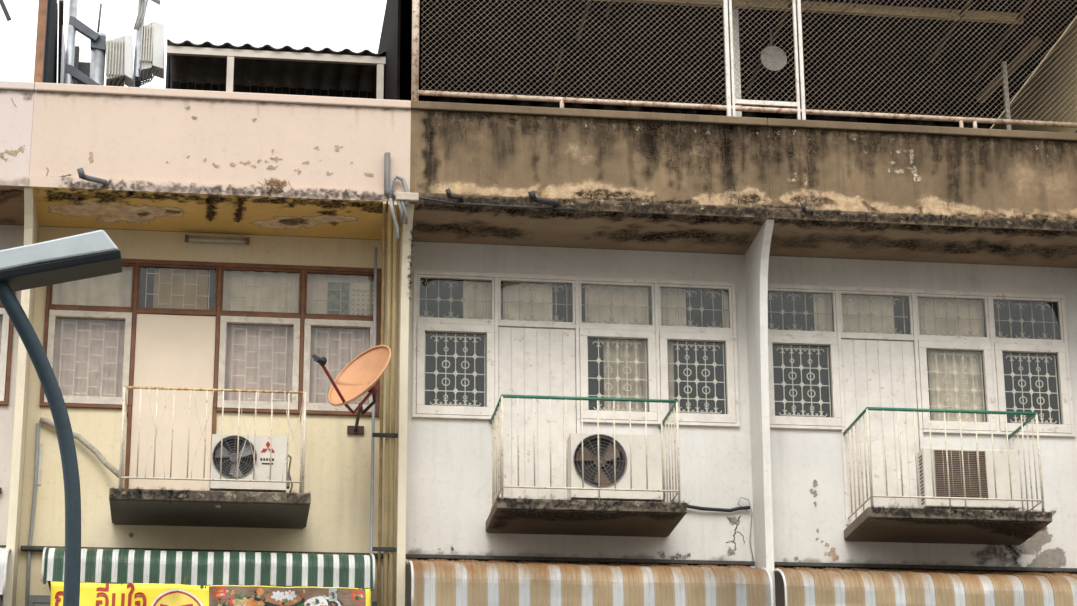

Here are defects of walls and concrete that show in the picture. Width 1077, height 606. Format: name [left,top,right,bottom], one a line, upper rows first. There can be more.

peeling [204,149,282,170]
peeling [888,138,921,181]
damp [45,178,395,213]
damp [414,110,1077,257]
peeling [1026,547,1066,568]